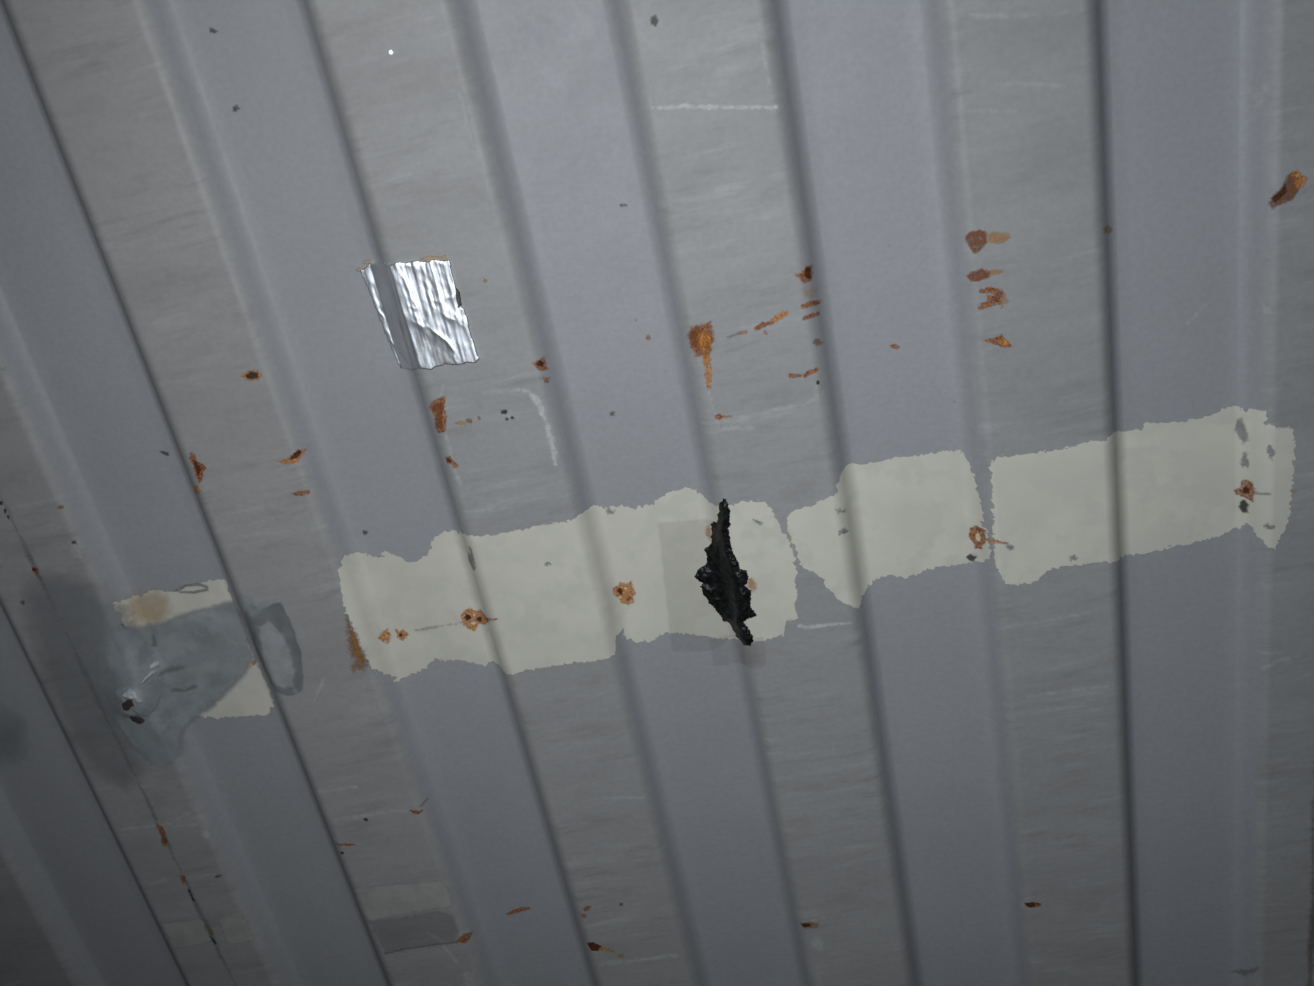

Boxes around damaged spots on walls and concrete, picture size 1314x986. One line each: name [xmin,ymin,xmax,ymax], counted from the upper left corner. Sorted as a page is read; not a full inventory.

rust [1270,172,1307,207]
rust [966,230,1008,253]
rust [796,266,812,282]
rust [967,269,1006,309]
rust [689,322,714,387]
rust [429,397,480,432]
rust [1235,480,1254,512]
peeling [337,406,1296,682]
rust [969,526,1013,549]
rust [613,582,636,604]
rust [461,609,497,631]
peeling [113,579,274,719]